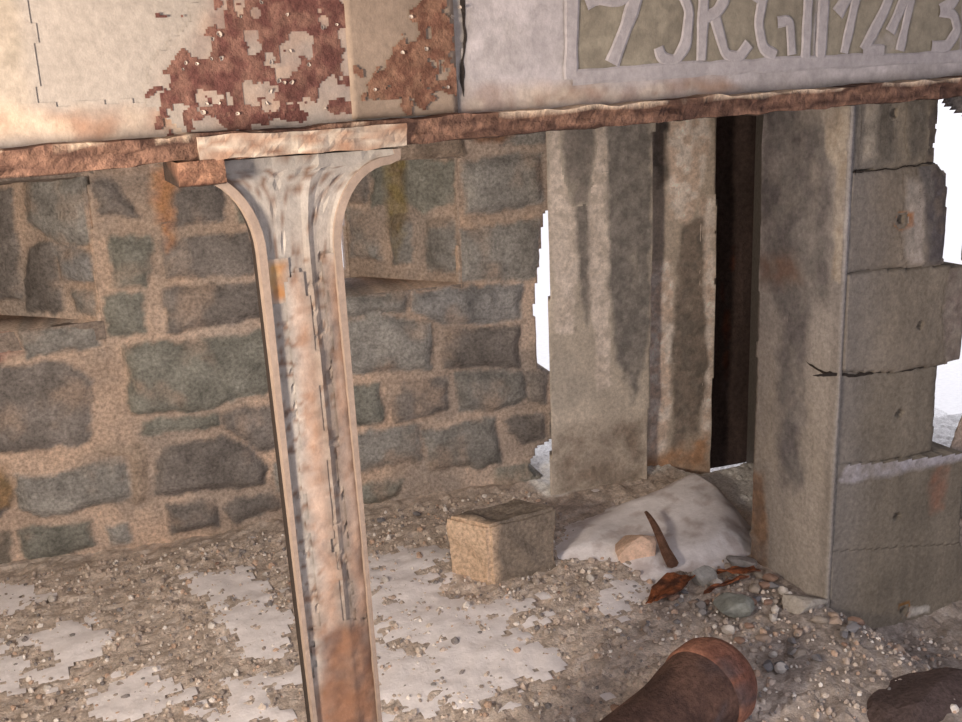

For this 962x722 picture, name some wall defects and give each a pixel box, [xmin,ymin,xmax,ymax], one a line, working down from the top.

peeling [145,0,462,136]
crack [459,0,467,96]
rust [268,253,377,722]
leakage [547,118,717,496]